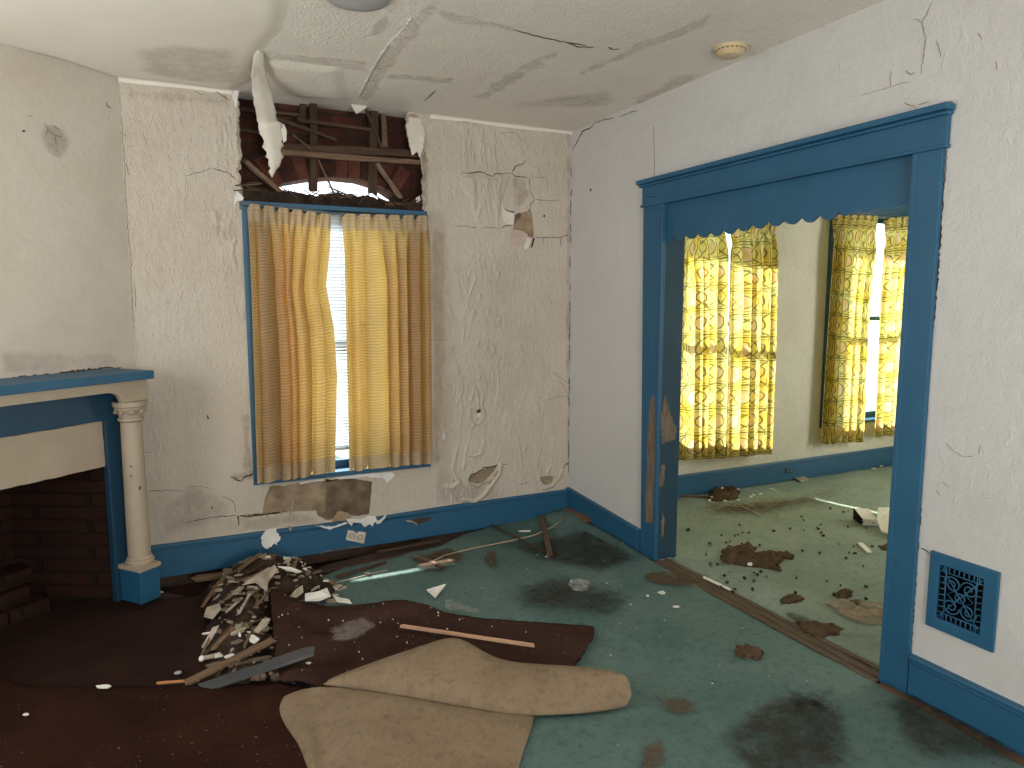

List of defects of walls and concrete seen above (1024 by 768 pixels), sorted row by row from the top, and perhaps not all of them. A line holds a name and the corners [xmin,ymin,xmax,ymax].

crack [358,16,412,98]
crack [514,29,620,50]
crack [860,2,941,108]
peeling [232,50,287,207]
flaking render [405,111,428,210]
flaking render [501,204,535,250]
crack [459,110,655,474]
crack [147,473,253,526]
flaking render [238,472,395,530]
peeling [644,396,677,538]